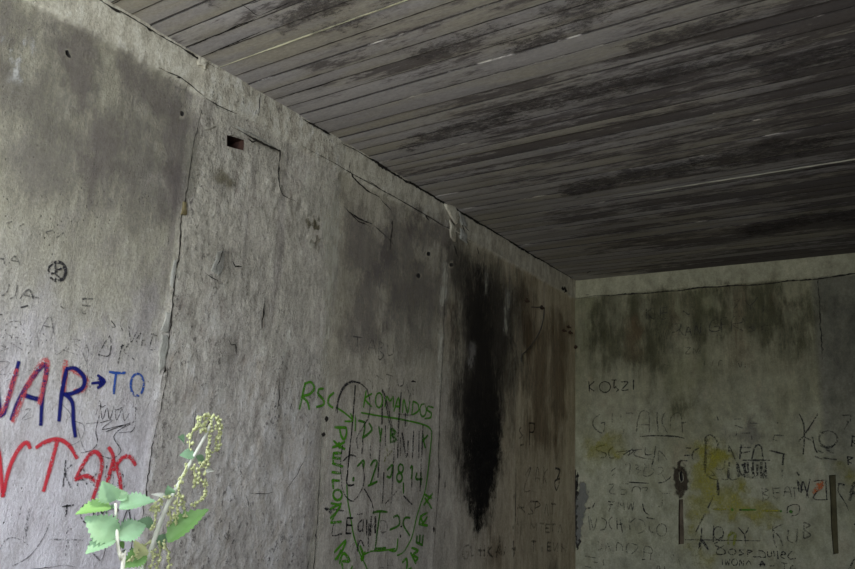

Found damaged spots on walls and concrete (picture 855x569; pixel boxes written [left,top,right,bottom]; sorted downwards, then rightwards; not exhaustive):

leakage [269,0,368,35]
leakage [410,0,616,60]
leakage [400,39,855,151]
leakage [559,137,836,196]
crack [100,0,295,549]